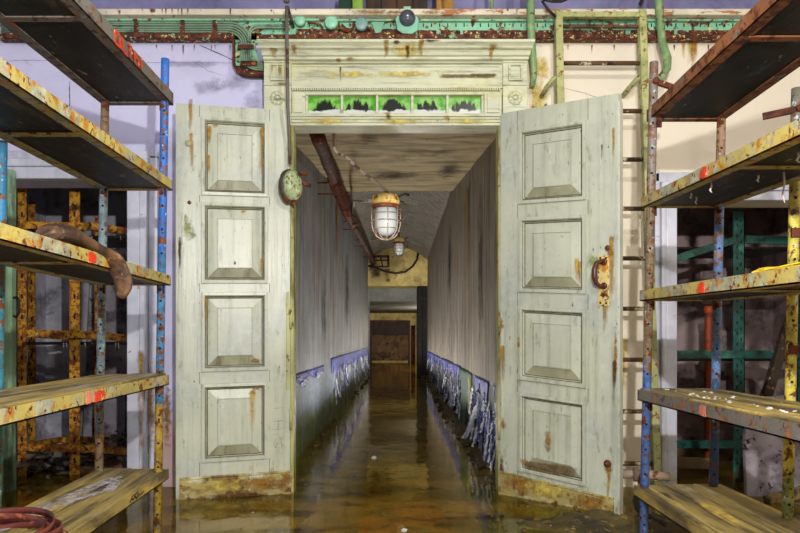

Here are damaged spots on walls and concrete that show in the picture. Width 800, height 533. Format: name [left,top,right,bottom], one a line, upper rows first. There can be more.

corrosion [384,39,437,57]
peeling [296,347,370,405]
peeling [426,351,504,472]